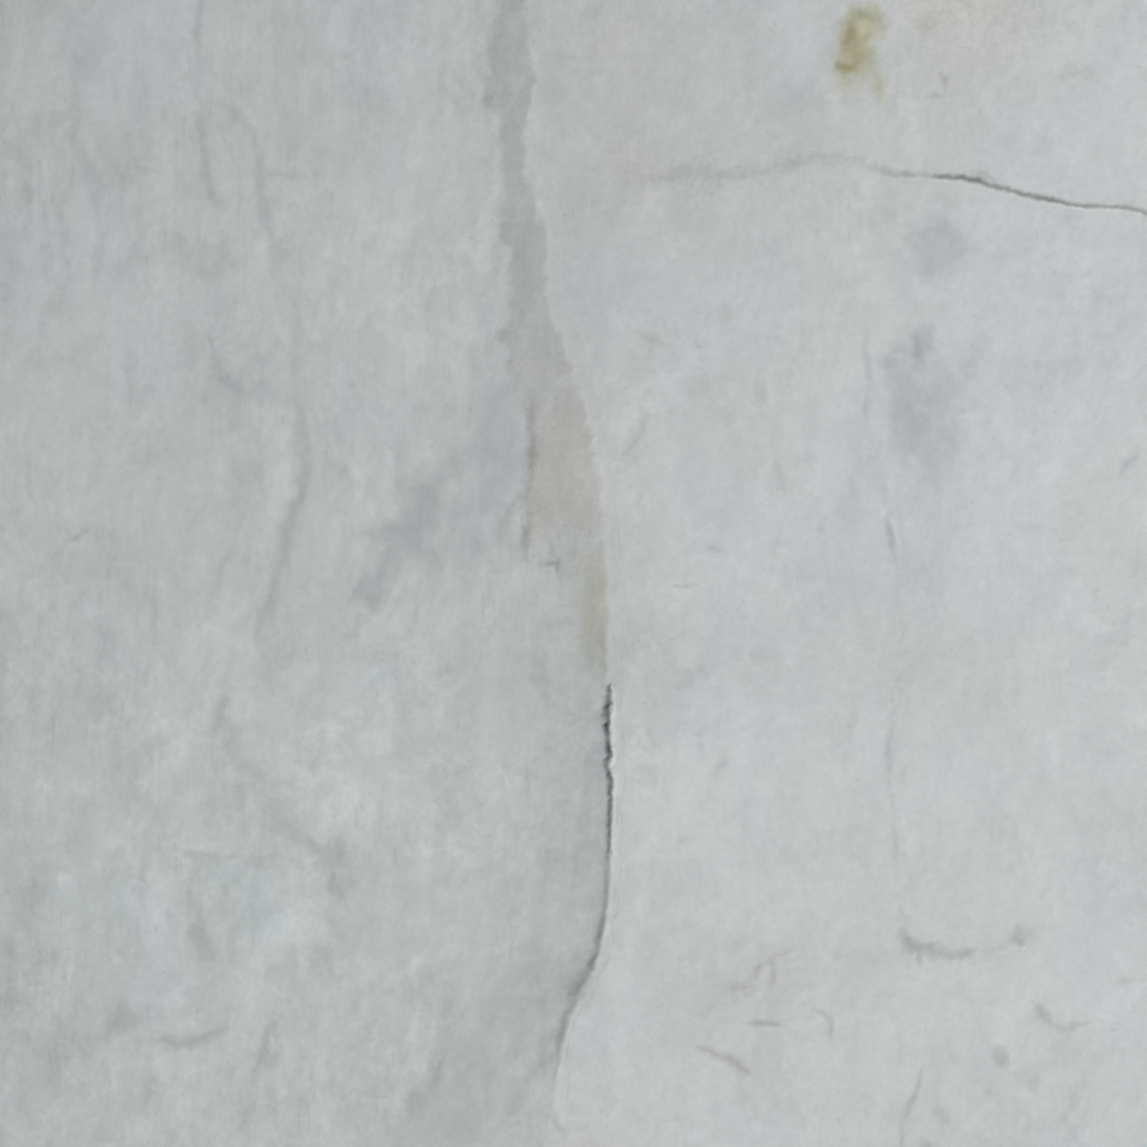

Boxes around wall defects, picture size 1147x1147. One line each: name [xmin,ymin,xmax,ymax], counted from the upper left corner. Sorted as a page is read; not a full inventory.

corrosion [826,0,904,115]
crack [619,144,1147,220]
crack [536,683,625,1147]